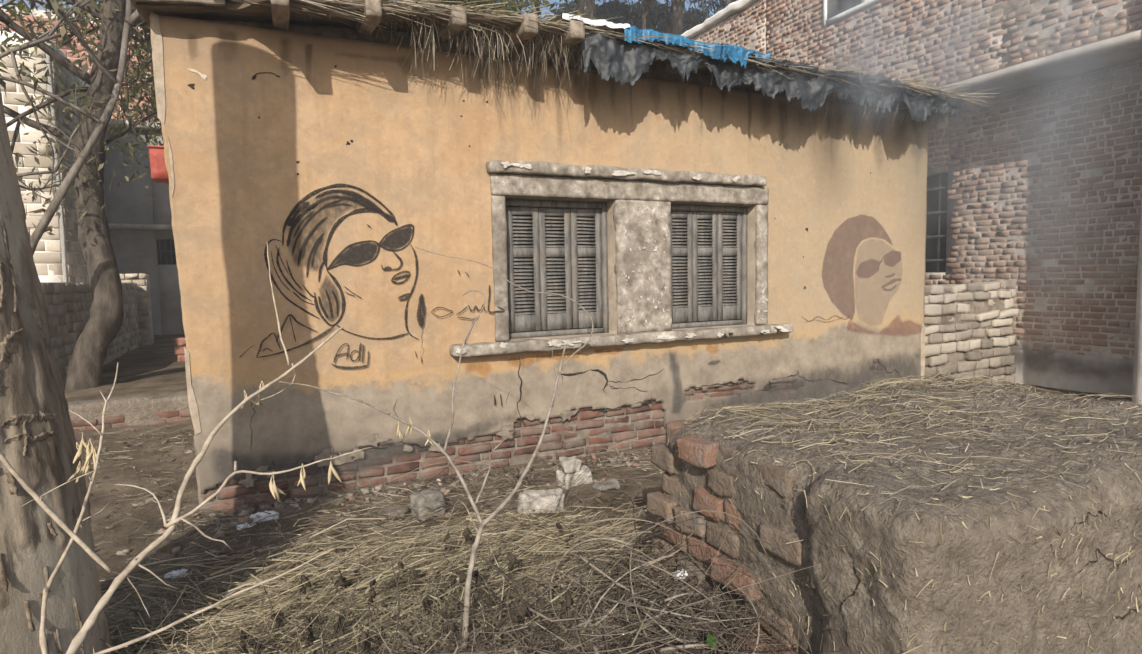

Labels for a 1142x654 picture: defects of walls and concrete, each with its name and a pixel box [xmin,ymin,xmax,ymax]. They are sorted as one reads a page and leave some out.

peeling [151,12,166,123]
peeling [501,161,532,169]
peeling [757,287,789,335]
peeling [547,340,591,348]
crack [502,357,525,424]
crack [561,368,665,411]
spalling [184,346,666,512]
crack [1075,544,1136,576]
crack [840,546,861,648]
crack [1115,606,1141,621]